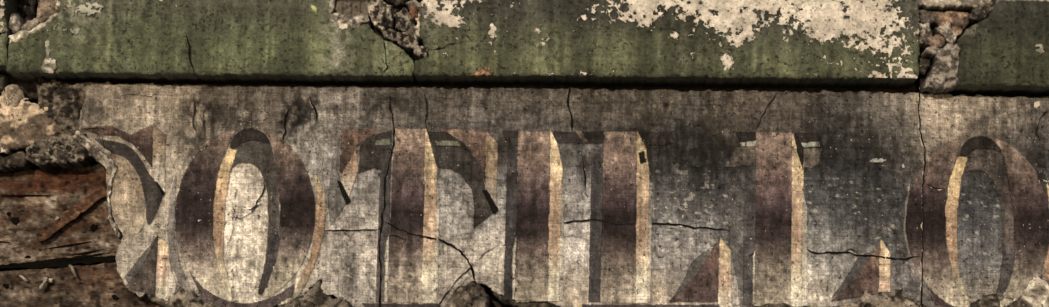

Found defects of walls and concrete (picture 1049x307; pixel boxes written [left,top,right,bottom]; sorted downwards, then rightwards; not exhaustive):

spalling [327,0,482,63]
peeling [484,14,508,55]
peeling [574,0,998,95]
spalling [471,67,493,77]
spalling [0,0,123,240]
crack [323,39,500,307]
crack [807,87,943,307]
spalling [147,288,220,307]
spalling [277,280,353,307]
spalling [445,282,560,307]
spalling [840,287,926,307]
spalling [970,275,1049,307]